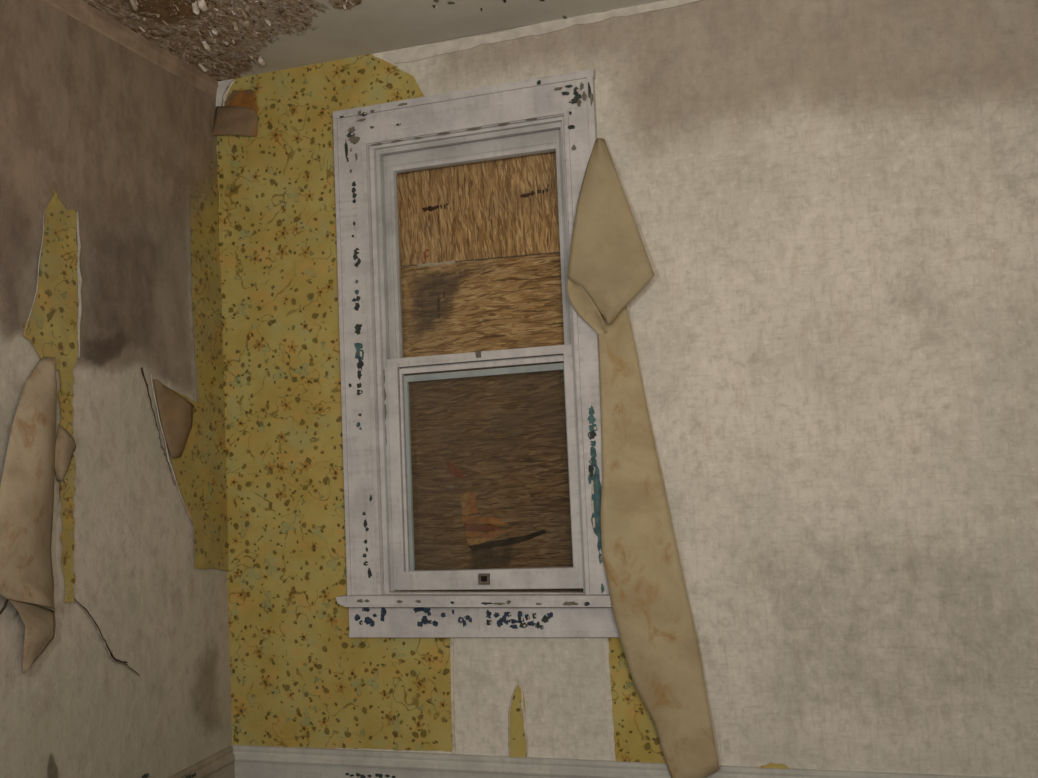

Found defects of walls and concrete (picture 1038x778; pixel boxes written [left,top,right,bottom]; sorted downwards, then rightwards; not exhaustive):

peeling [82,0,362,137]
peeling [385,0,702,63]
peeling [554,82,593,129]
damp [0,0,217,388]
peeling [339,110,423,203]
peeling [349,324,364,395]
peeling [588,405,602,564]
peeling [362,495,372,578]
crack [74,598,139,675]
peeling [354,599,387,627]
peeling [413,600,472,627]
peeling [481,600,553,630]